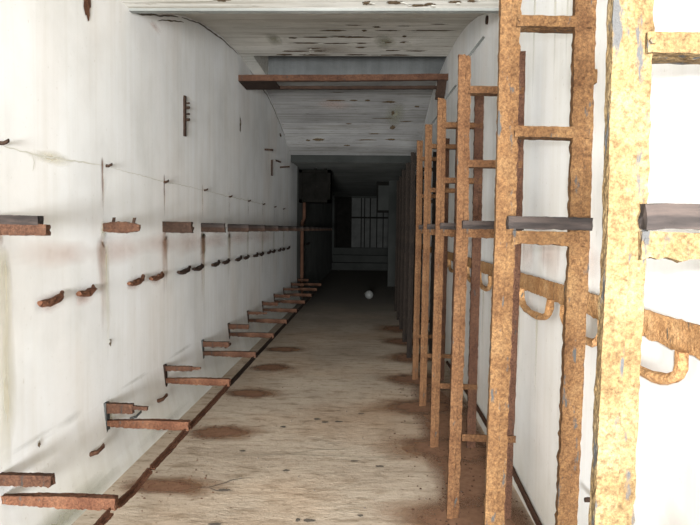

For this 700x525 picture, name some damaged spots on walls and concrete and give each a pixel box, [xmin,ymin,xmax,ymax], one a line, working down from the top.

crack [136,13,238,54]
crack [4,146,267,206]
corrosion [387,354,432,362]
corrosion [193,426,251,438]
corrosion [382,374,486,525]
corrosion [130,480,208,494]